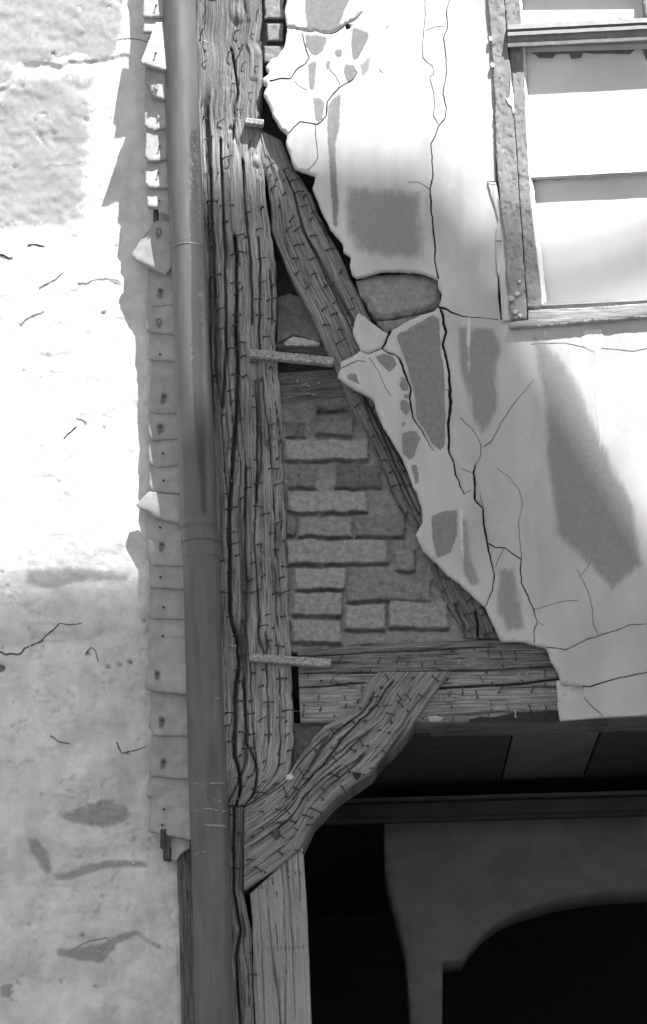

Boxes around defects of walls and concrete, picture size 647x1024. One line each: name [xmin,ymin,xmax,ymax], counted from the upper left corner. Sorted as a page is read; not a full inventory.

crack [269,24,383,171]
damp [328,95,418,253]
crack [416,0,450,279]
peeling [506,81,514,114]
spalling [356,274,441,333]
peeling [488,181,523,322]
crack [340,306,643,650]
damp [540,329,636,583]
crack [0,623,82,655]